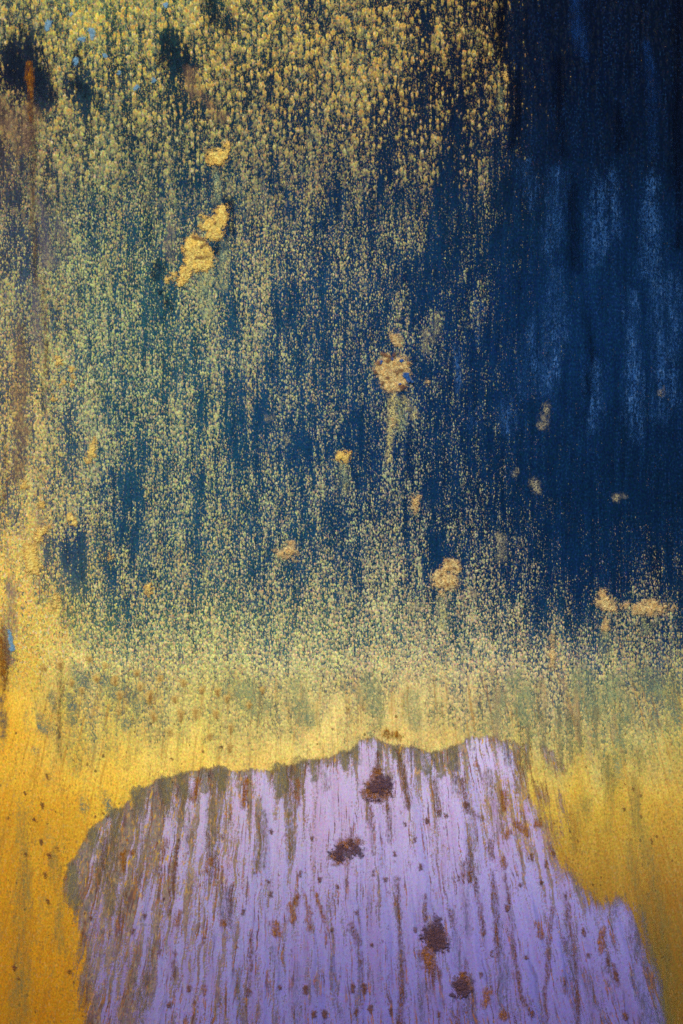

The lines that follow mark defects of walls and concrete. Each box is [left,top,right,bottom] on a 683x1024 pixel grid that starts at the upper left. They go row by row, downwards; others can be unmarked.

corrosion [359,752,411,836]
corrosion [327,831,365,865]
peeling [63,736,667,1024]
corrosion [372,871,492,1009]
corrosion [389,960,404,1024]